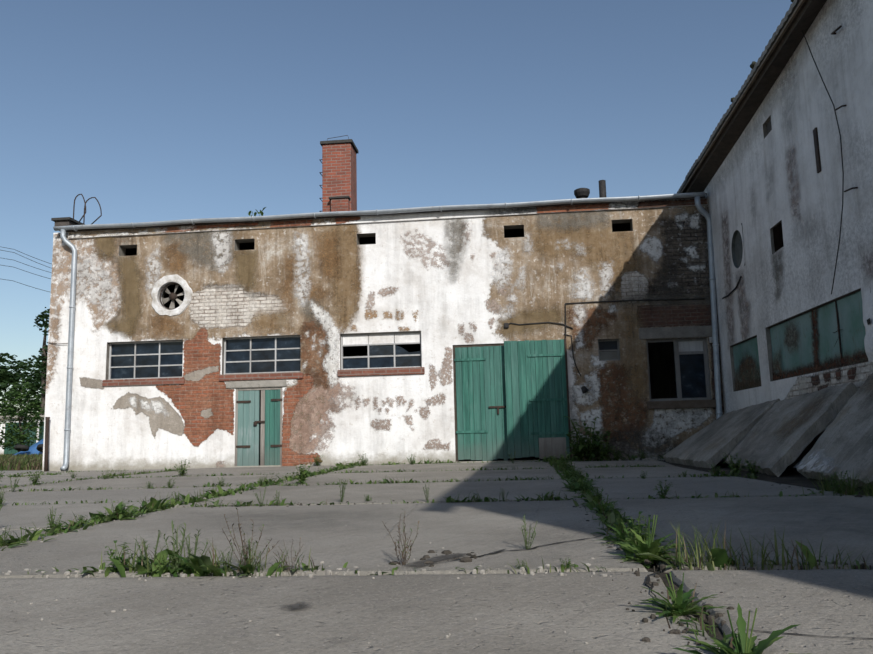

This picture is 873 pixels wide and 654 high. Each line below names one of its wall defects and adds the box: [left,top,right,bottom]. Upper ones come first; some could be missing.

leakage [76,236,161,334]
flaking render [46,217,453,466]
leakage [255,233,339,331]
leakage [447,218,464,273]
flaking render [458,322,477,343]
flaking render [482,199,734,453]
corrosion [735,356,761,390]
corrosion [772,309,868,380]